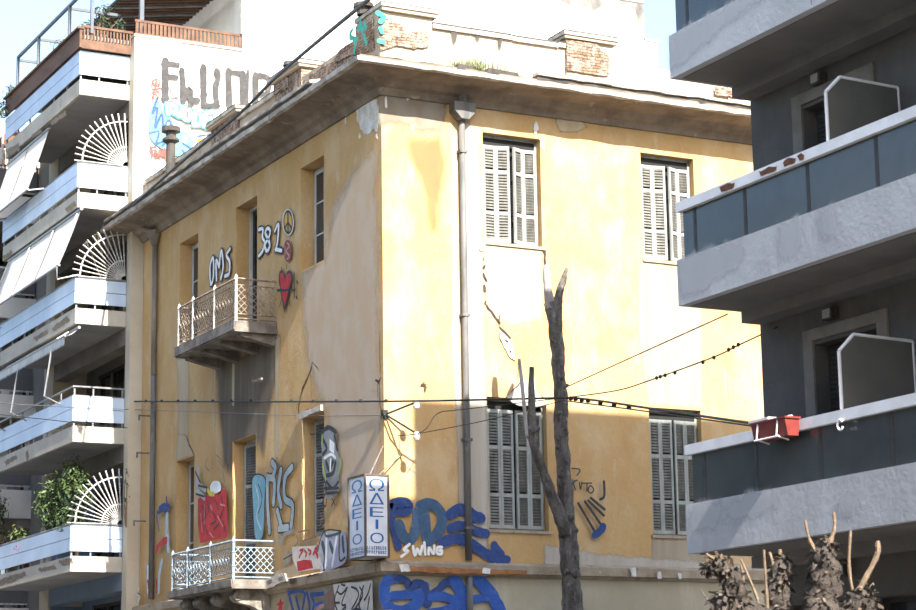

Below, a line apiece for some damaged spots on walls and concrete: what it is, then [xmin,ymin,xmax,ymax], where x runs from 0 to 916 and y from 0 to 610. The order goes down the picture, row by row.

flaking render [332,12,429,64]
flaking render [566,40,609,76]
leakage [557,0,646,35]
flaking render [356,95,446,139]
leakage [411,122,488,548]